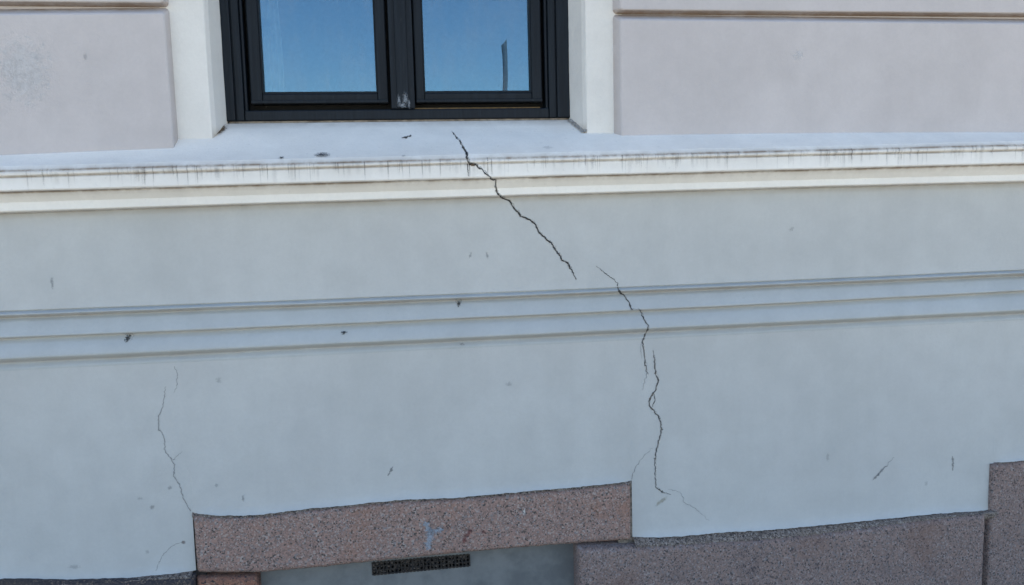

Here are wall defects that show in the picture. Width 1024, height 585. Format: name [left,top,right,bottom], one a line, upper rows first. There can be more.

crack [452,132,576,279]
crack [600,269,671,495]